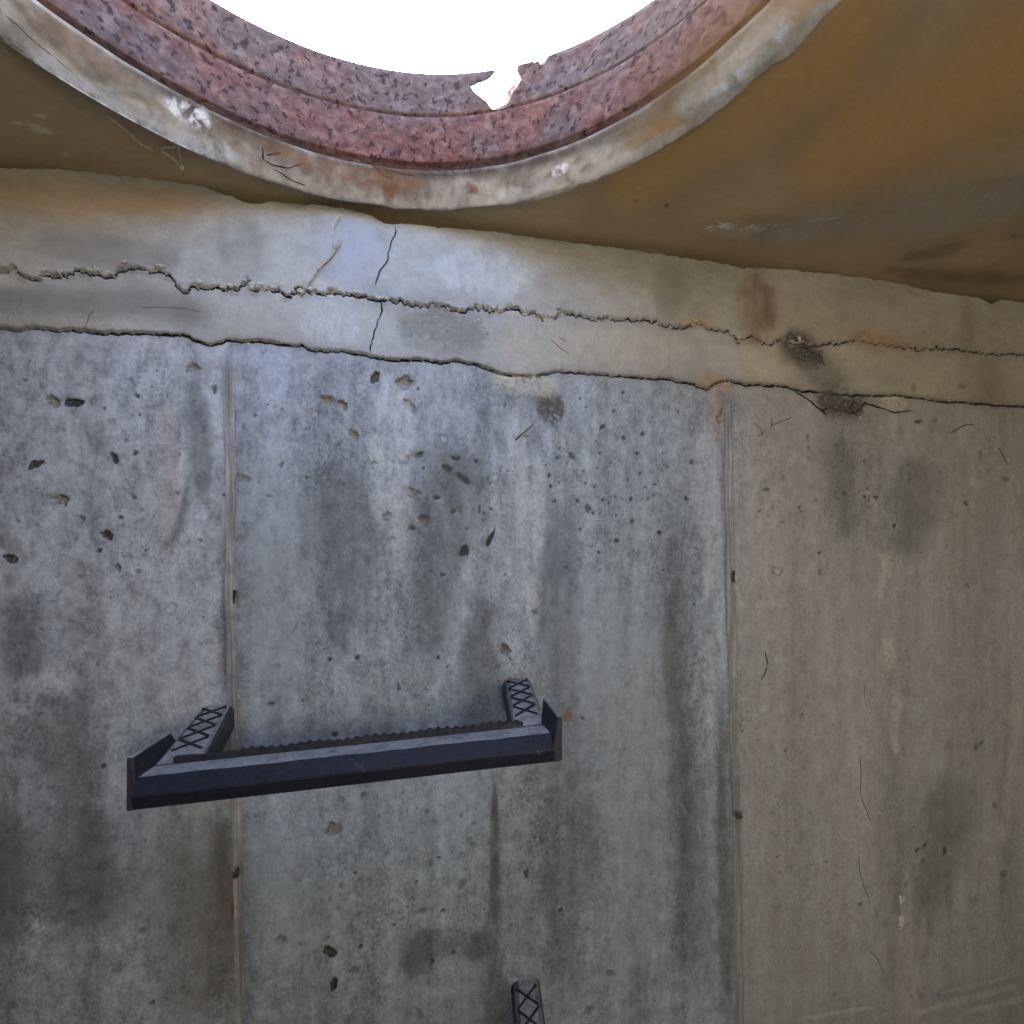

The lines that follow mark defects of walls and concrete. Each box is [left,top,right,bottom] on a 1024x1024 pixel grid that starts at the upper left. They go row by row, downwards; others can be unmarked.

crack [0,223,1024,437]
spalling [814,378,908,424]